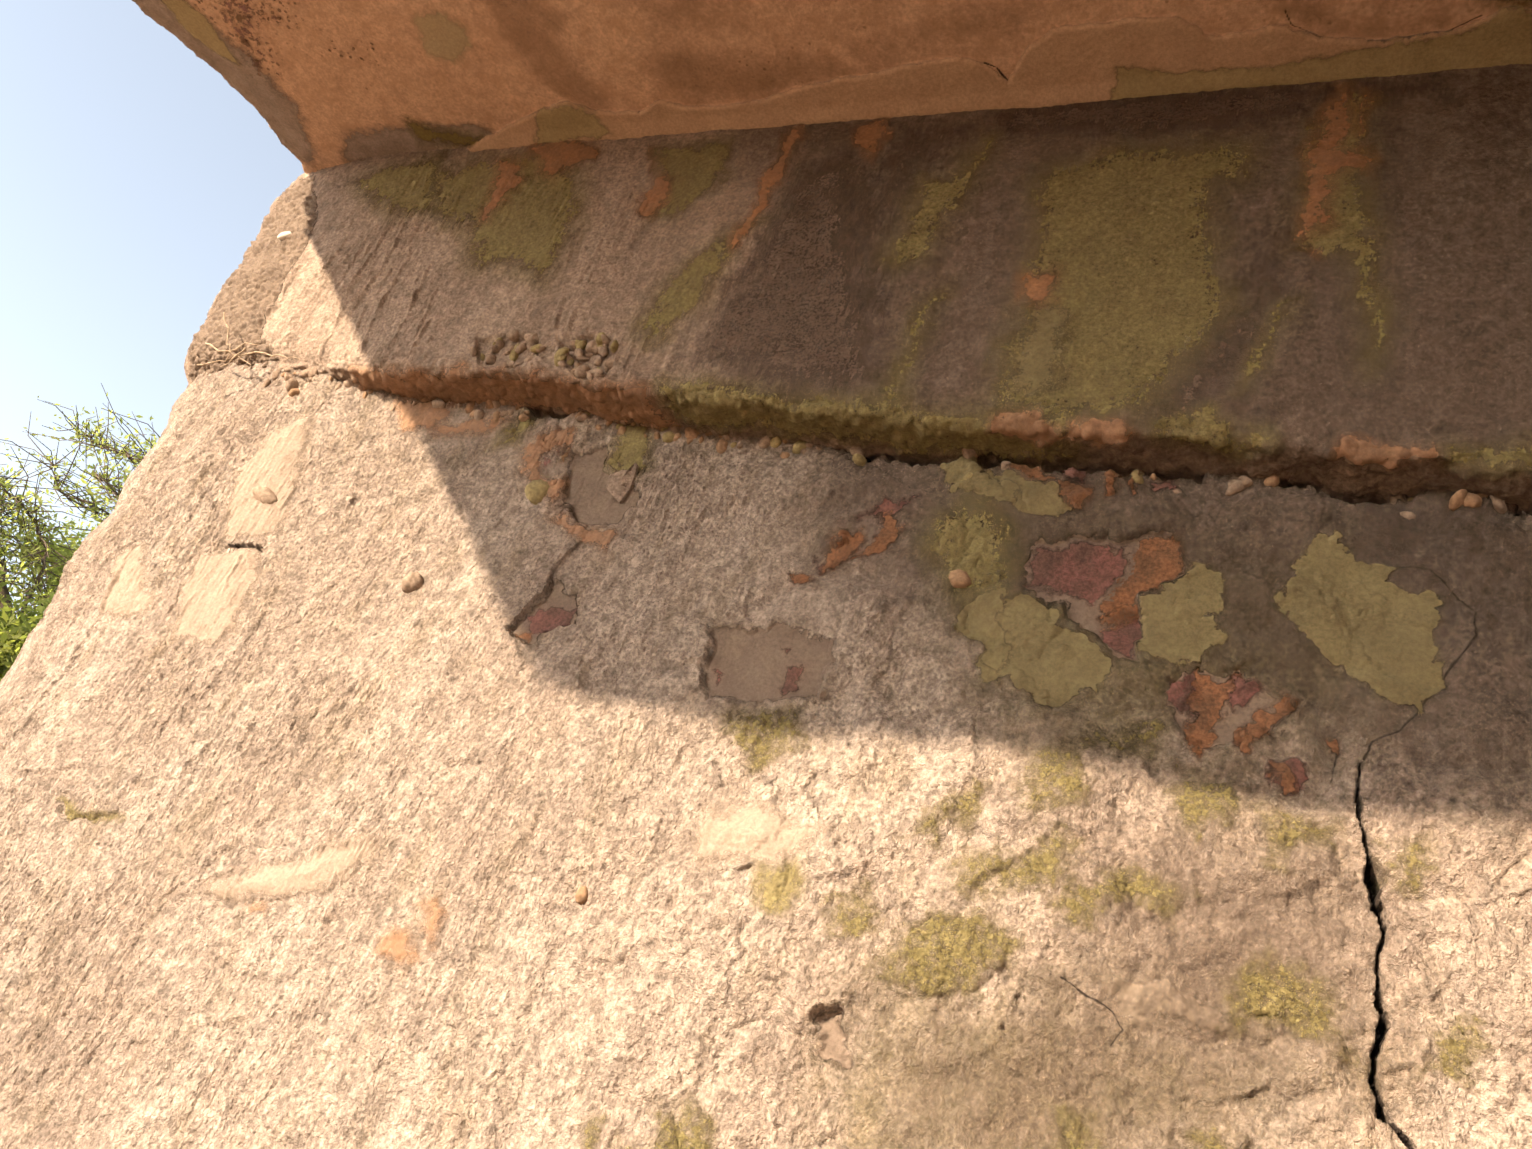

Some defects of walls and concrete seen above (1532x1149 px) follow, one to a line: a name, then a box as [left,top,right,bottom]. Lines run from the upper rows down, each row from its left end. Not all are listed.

peeling [467,7,1532,152]
corrosion [730,125,804,250]
water stain [696,75,1532,457]
corrosion [1297,83,1377,257]
crack [1331,567,1477,1149]